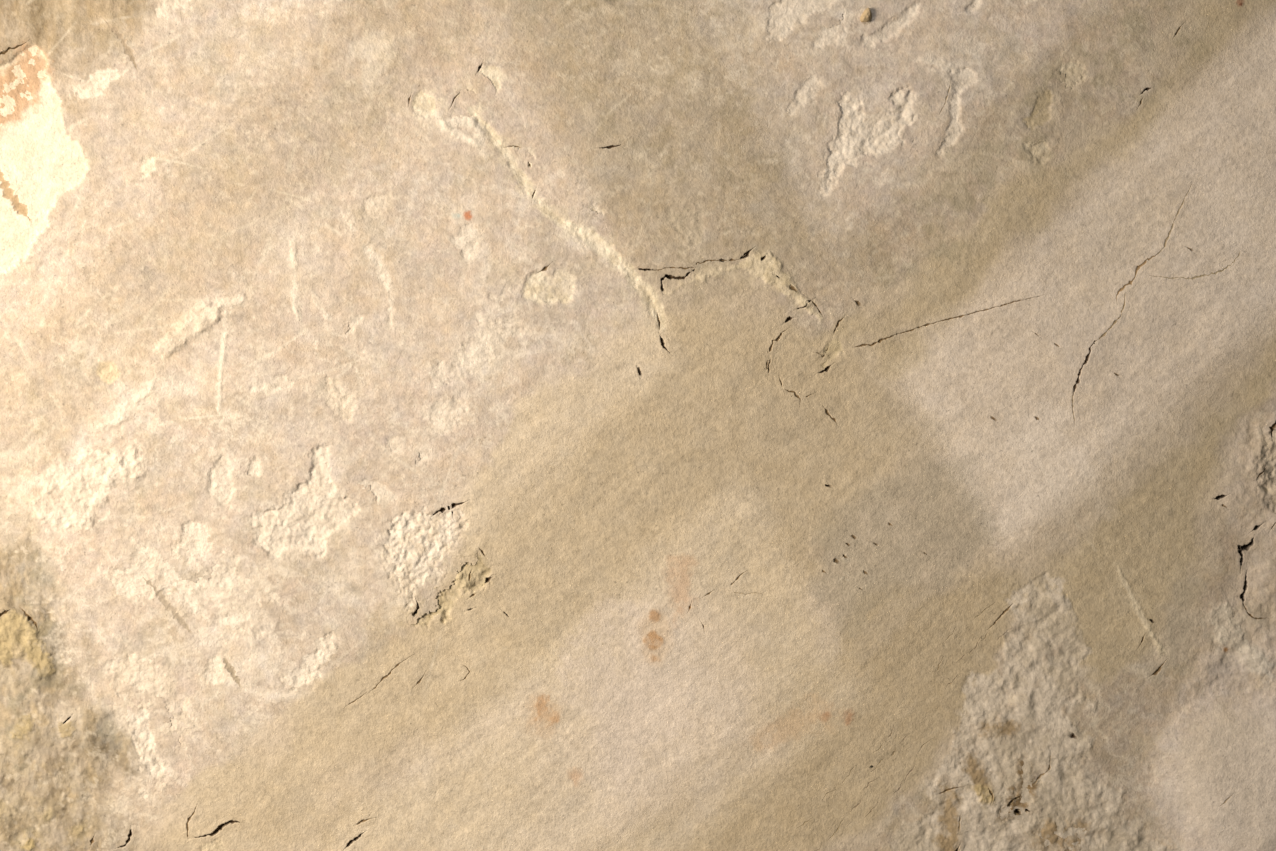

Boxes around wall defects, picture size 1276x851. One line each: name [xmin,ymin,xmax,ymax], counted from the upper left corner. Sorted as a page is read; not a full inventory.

flaking render [0,0,218,298]
crack [393,48,1046,381]
crack [1066,180,1246,427]
crack [1209,488,1276,625]